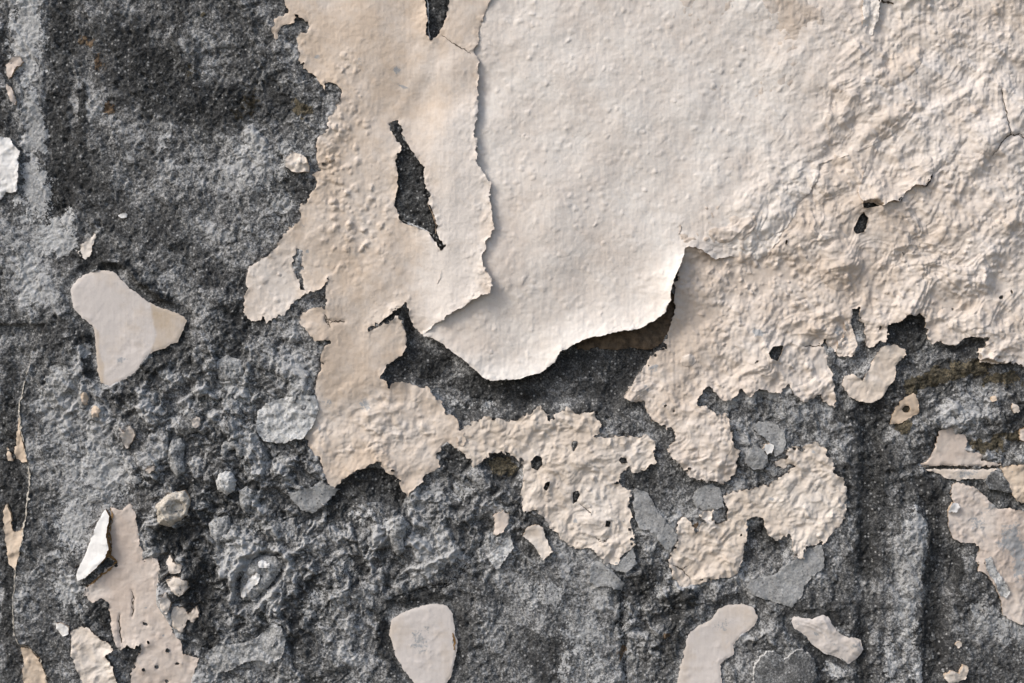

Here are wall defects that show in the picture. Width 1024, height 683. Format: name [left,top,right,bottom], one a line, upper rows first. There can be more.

peeling [5,56,24,105]
peeling [0,137,22,200]
peeling [78,233,96,259]
flaking render [71,270,187,386]
peeling [241,0,1024,683]
peeling [80,392,101,417]
peeling [6,418,28,463]
peeling [119,426,136,449]
peeling [3,503,23,570]
peeling [55,504,200,683]
peeling [21,647,48,683]